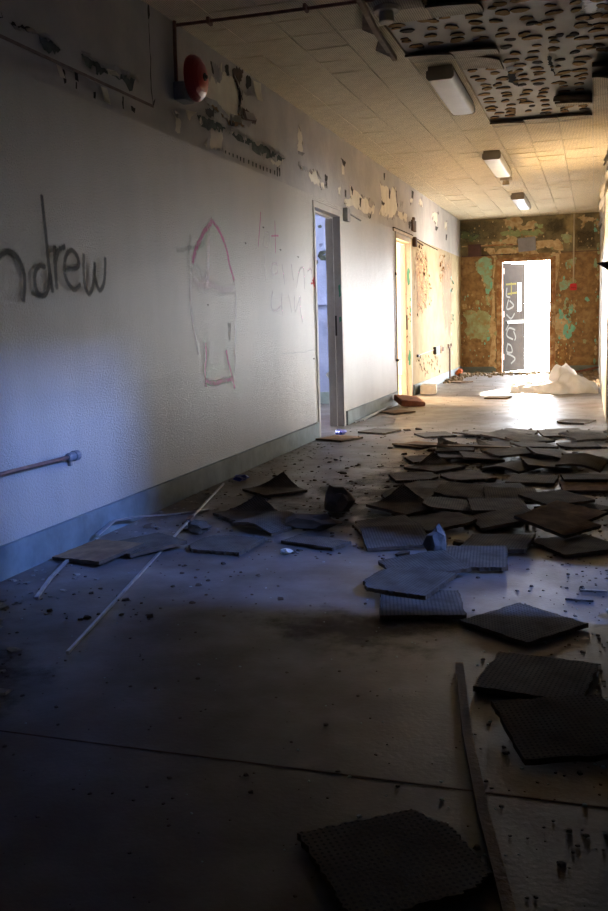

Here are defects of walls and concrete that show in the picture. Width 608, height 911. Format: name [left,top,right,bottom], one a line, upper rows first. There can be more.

spalling [0,13,79,89]
spalling [81,50,139,113]
spalling [505,66,522,86]
peeling [197,61,286,177]
peeling [297,124,328,190]
peeling [338,173,423,229]
peeling [407,244,454,320]